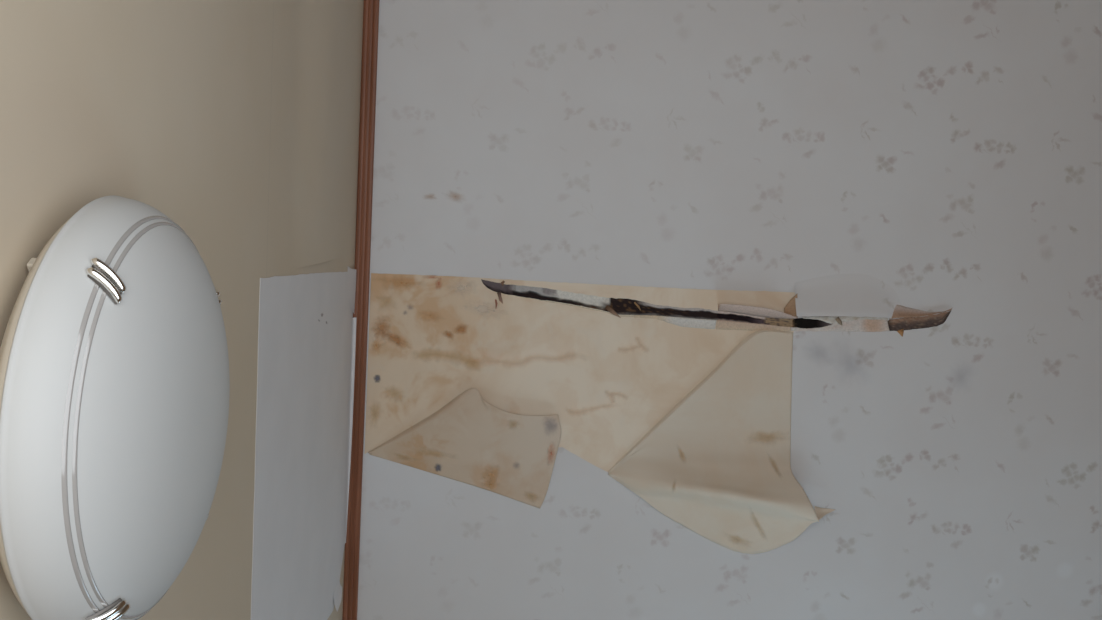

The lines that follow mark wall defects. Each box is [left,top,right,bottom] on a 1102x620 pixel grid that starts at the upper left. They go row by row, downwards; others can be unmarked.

crack [481,274,953,337]